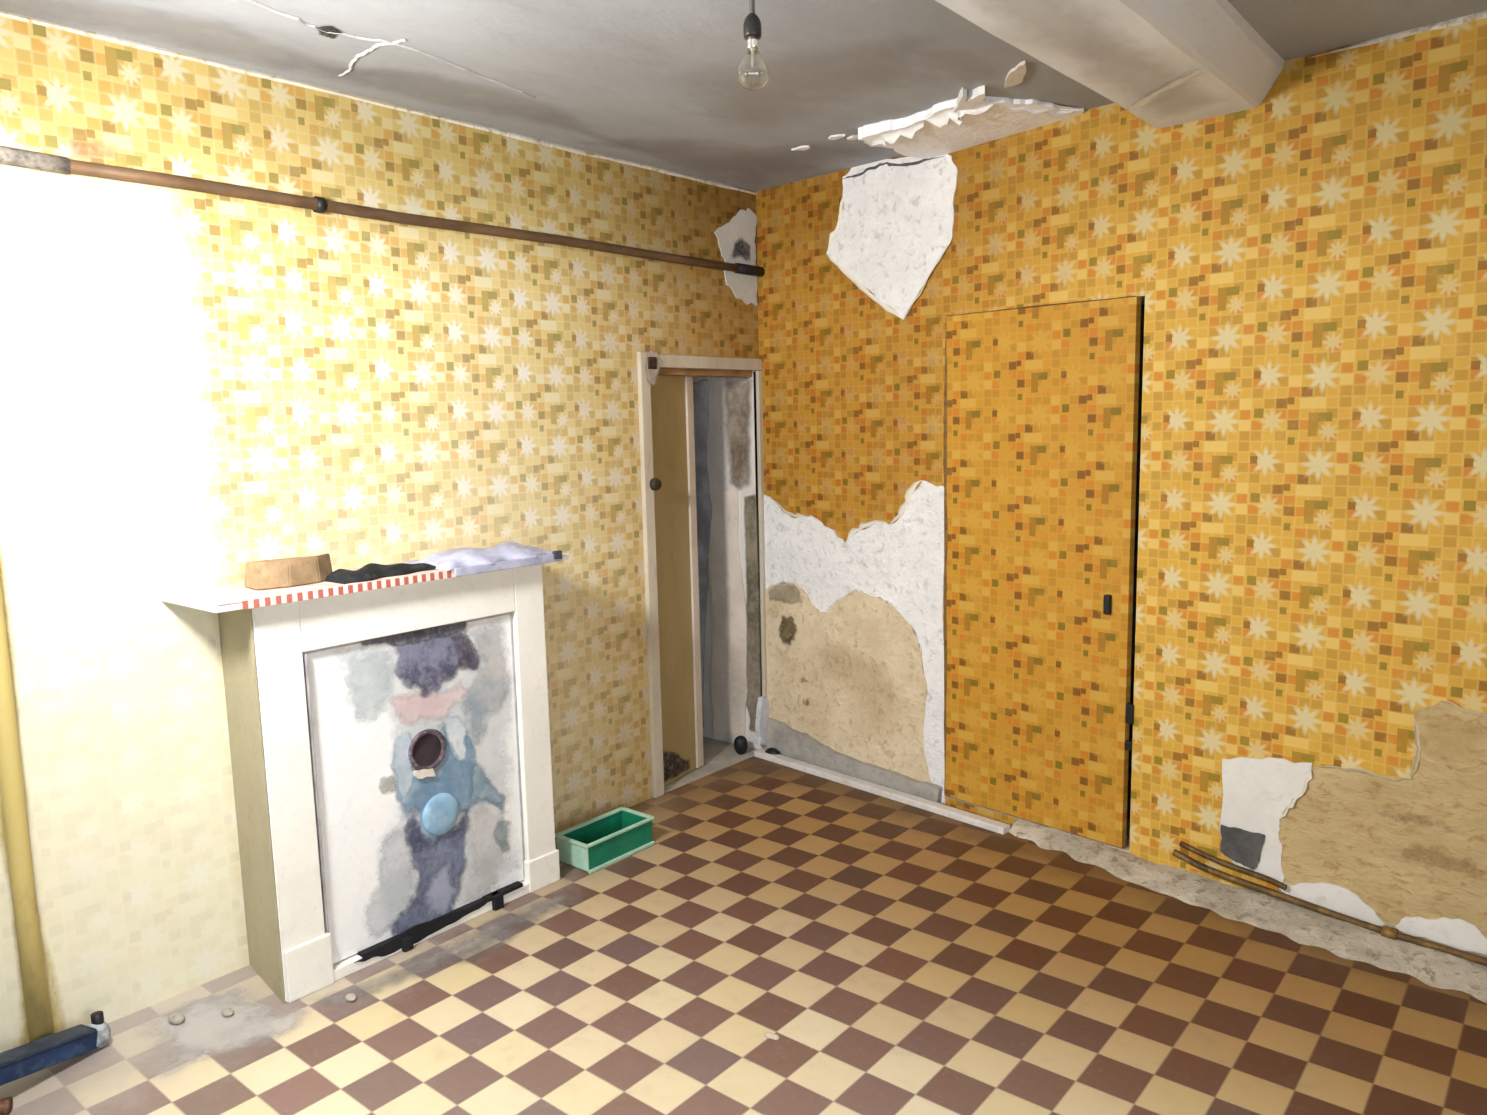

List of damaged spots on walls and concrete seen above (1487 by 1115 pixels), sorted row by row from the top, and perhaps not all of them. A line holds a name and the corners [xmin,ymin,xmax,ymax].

peeling [828,60,1084,159]
spalling [714,208,758,306]
spalling [693,380,932,783]
spalling [1278,701,1487,958]